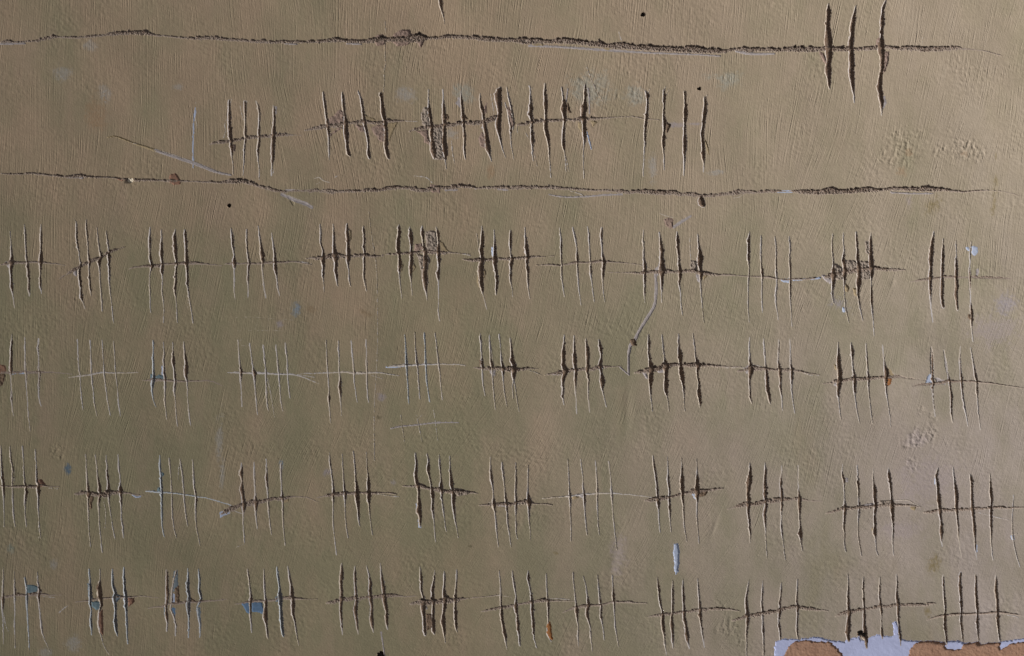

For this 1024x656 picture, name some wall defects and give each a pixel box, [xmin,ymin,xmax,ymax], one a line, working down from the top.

peeling [774,621,1024,656]